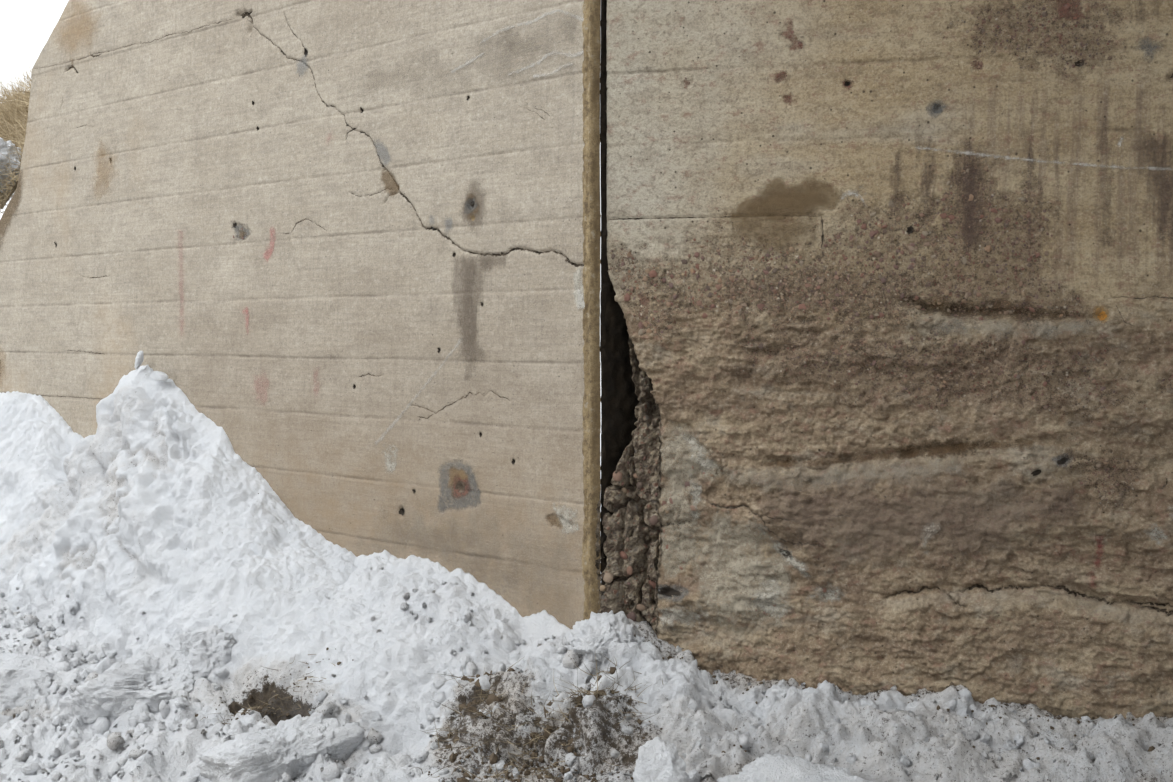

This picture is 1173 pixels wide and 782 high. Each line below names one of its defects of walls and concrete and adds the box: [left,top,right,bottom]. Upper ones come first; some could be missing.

crack [35,12,584,267]
leakage [733,179,858,242]
spalling [600,155,1148,635]
crack [886,584,1173,616]